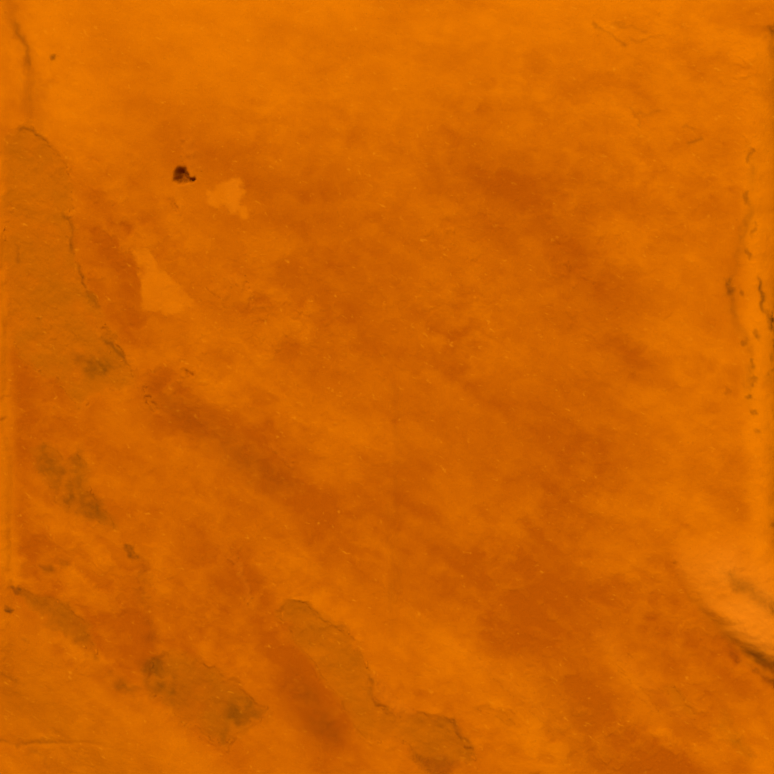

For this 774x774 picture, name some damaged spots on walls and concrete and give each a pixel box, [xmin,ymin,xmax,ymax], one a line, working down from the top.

flaking render [177,169,195,182]